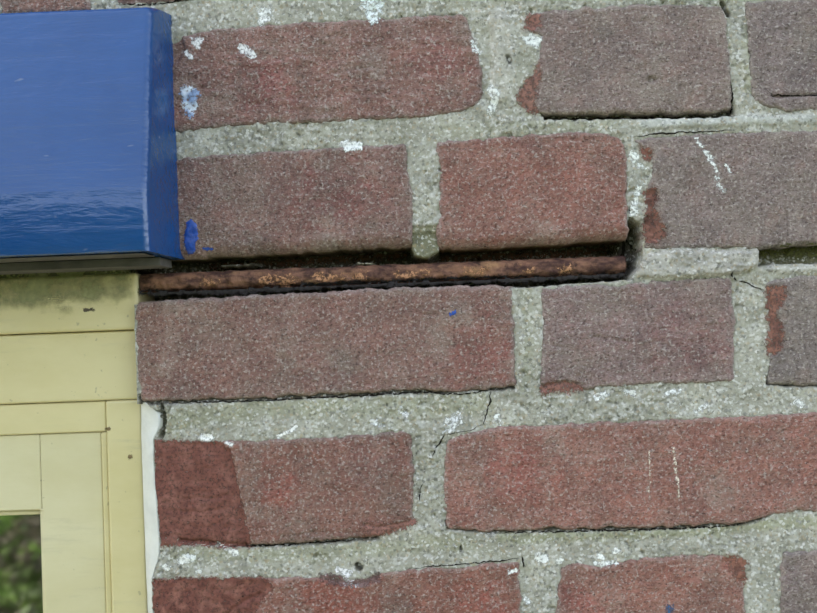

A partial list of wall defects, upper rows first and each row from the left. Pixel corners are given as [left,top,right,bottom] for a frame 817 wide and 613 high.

spalling [524,13,542,33]
spalling [516,62,543,115]
crack [765,88,817,97]
rust [200,246,433,288]
rust [441,241,610,276]
spalling [763,285,790,357]
crack [157,389,500,456]